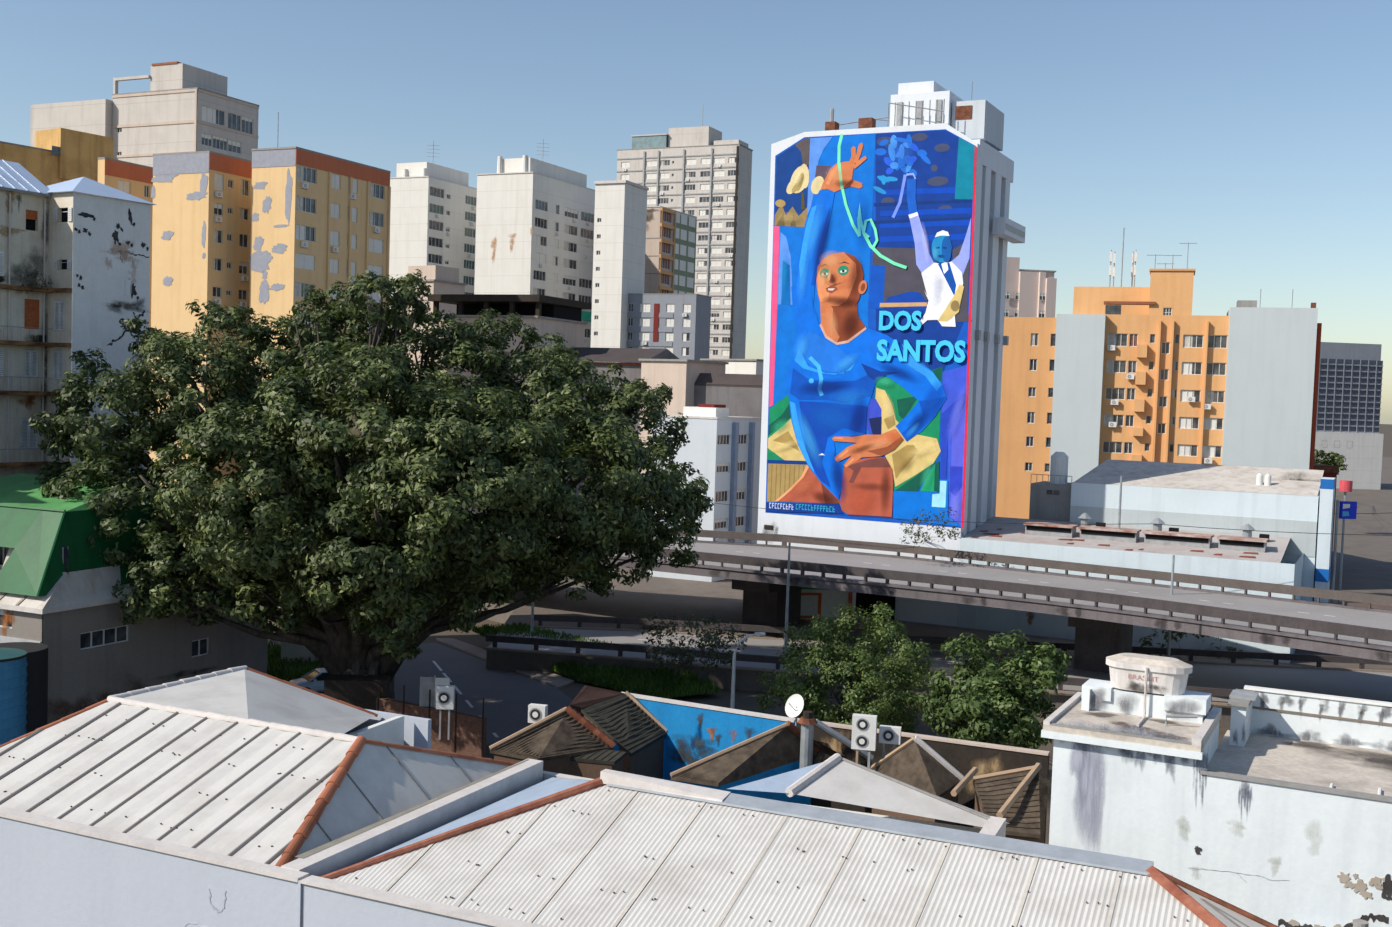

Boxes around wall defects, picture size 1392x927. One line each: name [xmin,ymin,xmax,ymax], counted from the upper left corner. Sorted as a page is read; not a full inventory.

peeling [151,174,178,199]
peeling [186,173,208,201]
flaking render [74,212,96,236]
flaking render [106,208,174,265]
peeling [249,168,293,304]
water stain [1062,684,1208,838]
flaking render [1278,871,1392,927]